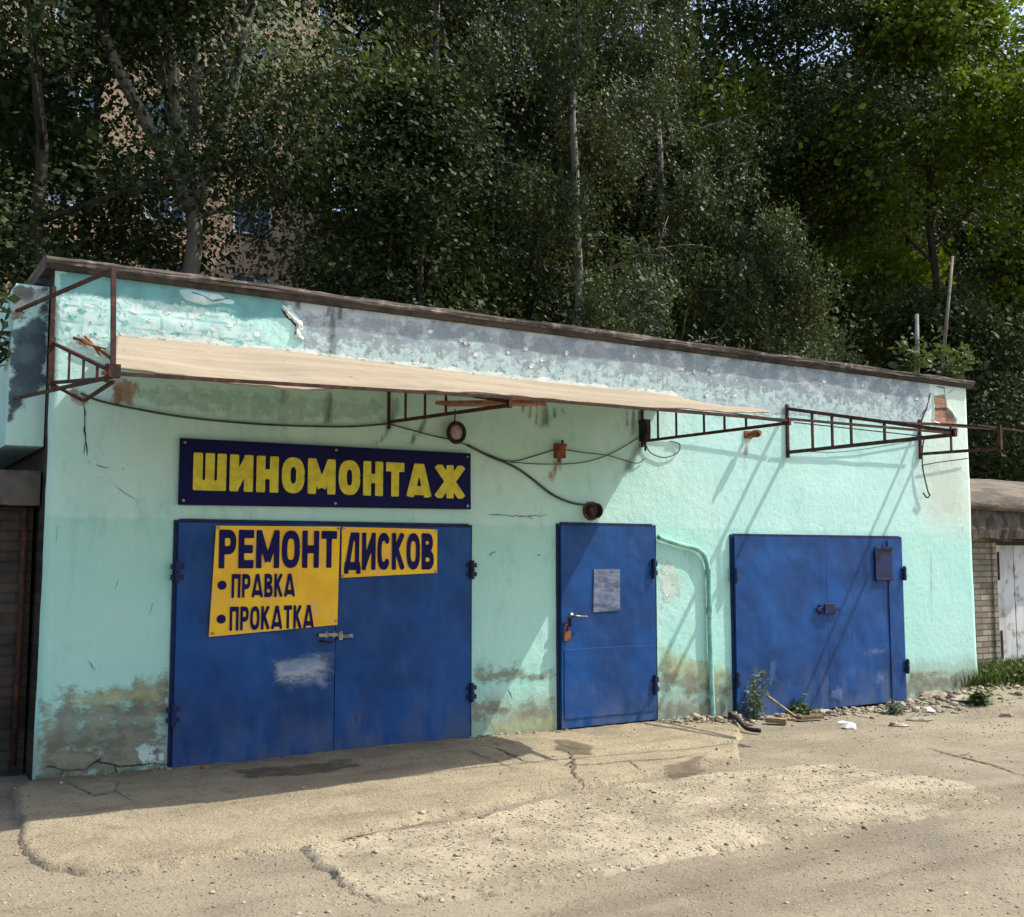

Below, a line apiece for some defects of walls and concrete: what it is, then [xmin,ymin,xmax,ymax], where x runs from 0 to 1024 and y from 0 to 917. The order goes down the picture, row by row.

damp [7,284,49,422]
peeling [56,272,958,428]
corrosion [114,380,136,404]
crack [83,403,137,500]
peeling [658,558,682,608]
damp [477,669,556,681]
damp [660,655,730,720]
damp [36,679,168,779]
damp [472,699,556,733]
crack [46,758,167,803]
peeling [136,744,164,769]